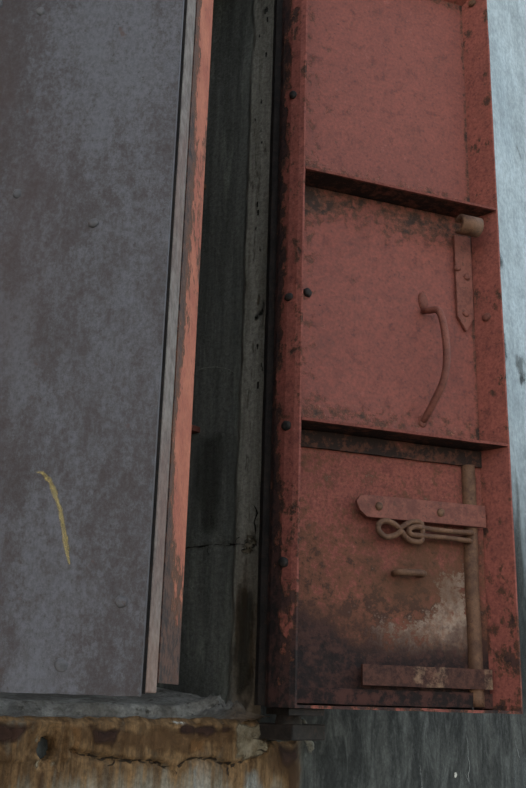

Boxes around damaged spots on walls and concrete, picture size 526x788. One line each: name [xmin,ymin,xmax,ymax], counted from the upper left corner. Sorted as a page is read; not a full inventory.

rust [0,723,28,743]
rust [73,725,234,753]
crack [69,749,258,776]